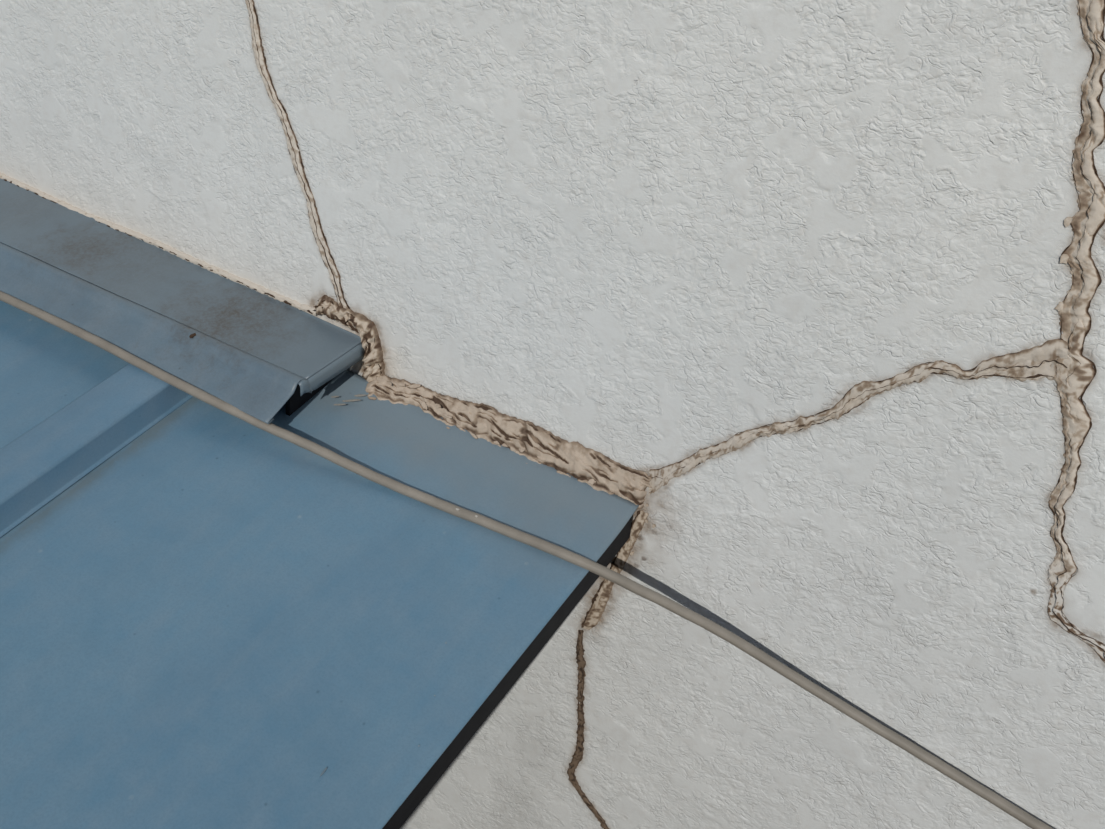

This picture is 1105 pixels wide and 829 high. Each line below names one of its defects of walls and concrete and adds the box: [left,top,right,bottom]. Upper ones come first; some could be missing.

crack [245,0,382,375]
crack [567,0,1105,829]